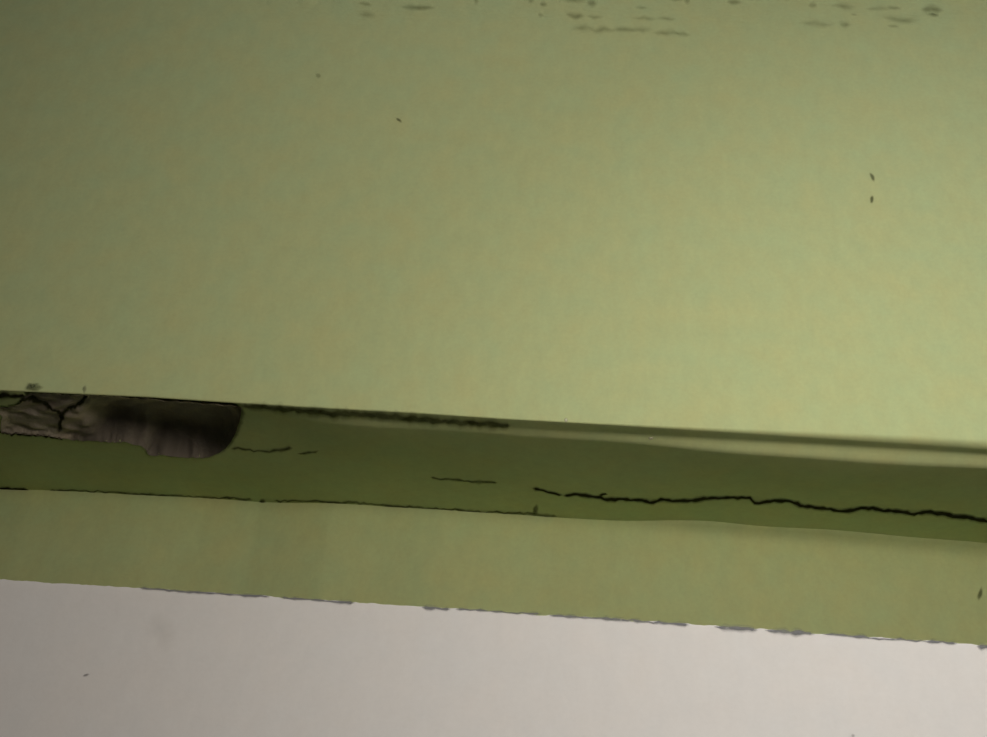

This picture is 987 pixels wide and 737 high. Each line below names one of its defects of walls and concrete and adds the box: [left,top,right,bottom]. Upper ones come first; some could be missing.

flaking render [0,384,242,458]
crack [52,489,250,500]
crack [432,476,496,484]
crack [276,488,987,523]